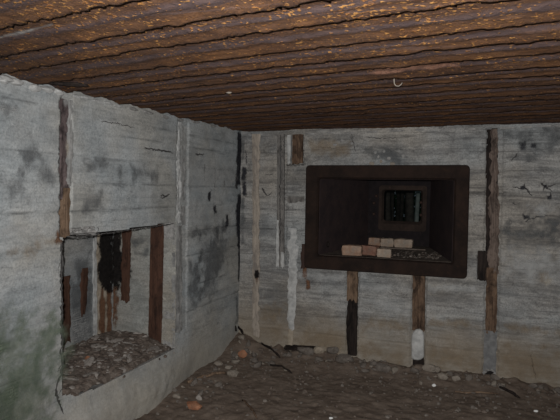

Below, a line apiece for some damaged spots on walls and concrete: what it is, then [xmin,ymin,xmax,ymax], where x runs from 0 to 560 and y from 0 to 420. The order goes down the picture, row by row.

crack [513,183,556,199]
crack [513,202,547,222]